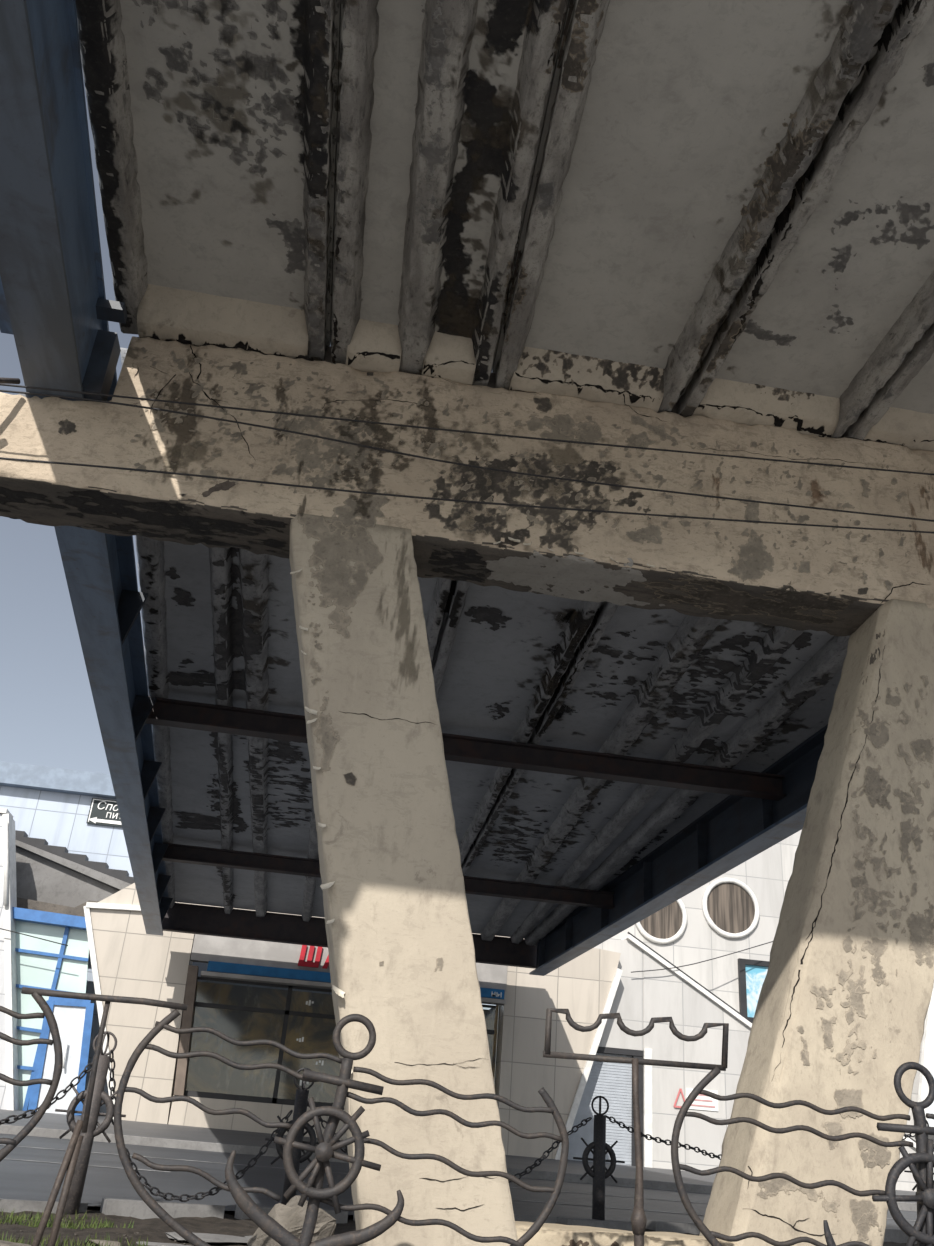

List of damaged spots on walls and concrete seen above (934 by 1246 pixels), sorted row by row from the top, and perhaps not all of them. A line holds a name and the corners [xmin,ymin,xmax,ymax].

crack [838,0,922,123]
crack [733,159,814,344]
peeling [130,0,934,841]
crack [502,283,934,464]
crack [339,711,436,725]
crack [772,647,885,1080]